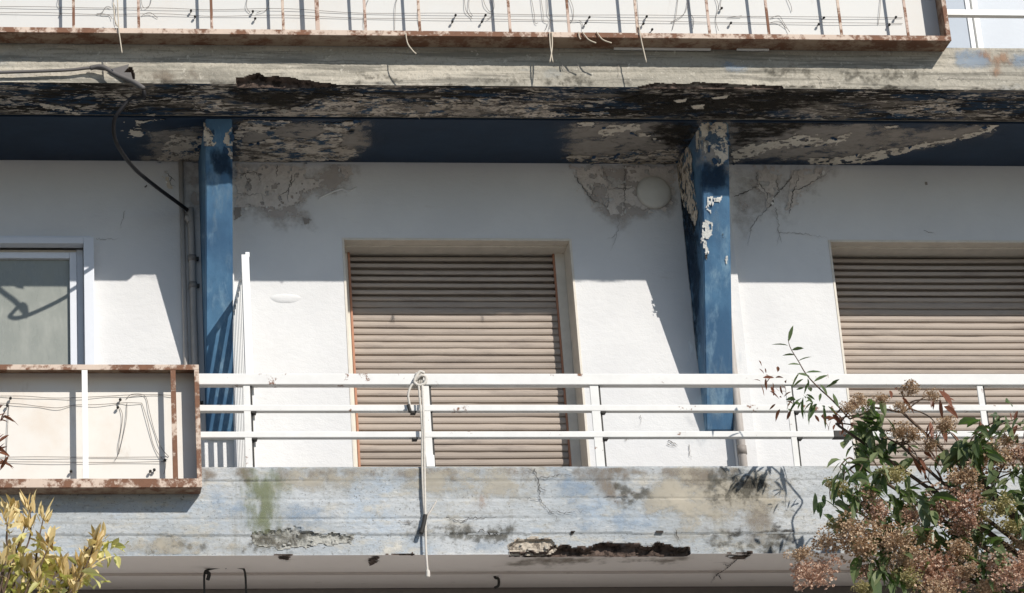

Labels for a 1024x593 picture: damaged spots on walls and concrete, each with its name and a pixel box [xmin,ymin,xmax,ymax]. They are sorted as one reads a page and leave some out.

peeling [40,103,80,115]
peeling [122,73,998,260]
crack [734,171,827,242]
spalling [251,526,354,562]
spalling [507,531,691,557]